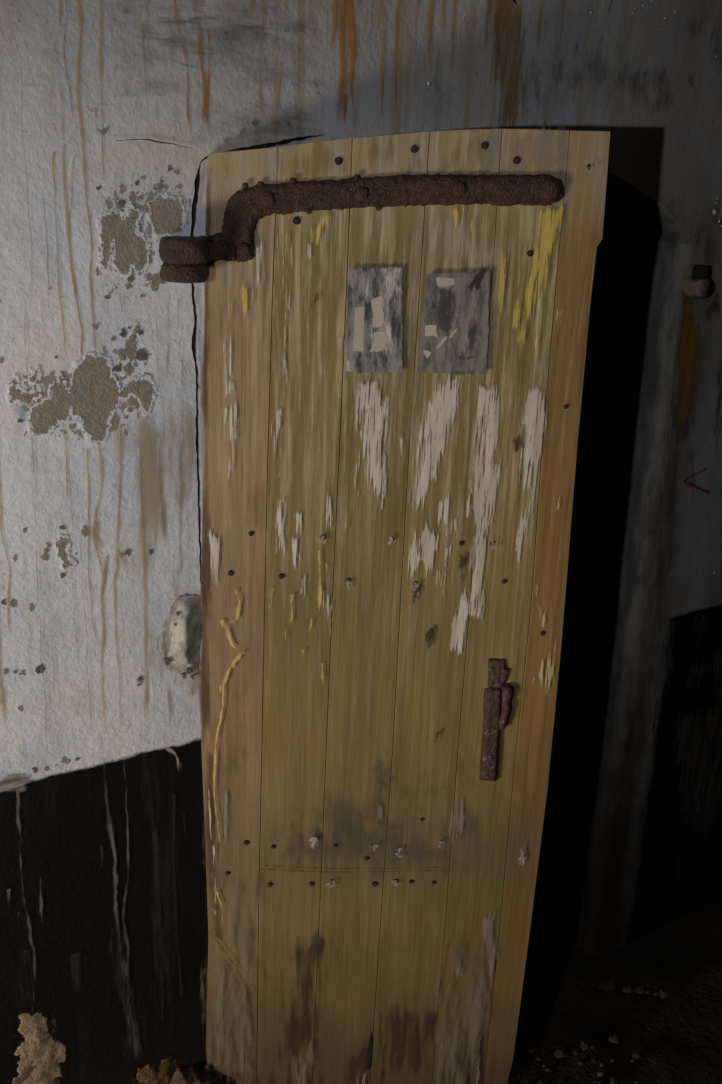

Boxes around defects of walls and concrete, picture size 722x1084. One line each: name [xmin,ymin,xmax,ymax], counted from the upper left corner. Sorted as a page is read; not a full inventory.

rust [67,0,92,244]
rust [183,29,209,122]
rust [332,0,360,116]
rust [52,145,95,398]
peeling [91,165,192,299]
peeling [1,320,157,446]
rust [675,298,700,427]
rust [0,487,11,626]
rust [87,449,119,668]
spalling [12,1012,68,1084]
spalling [136,1058,171,1084]